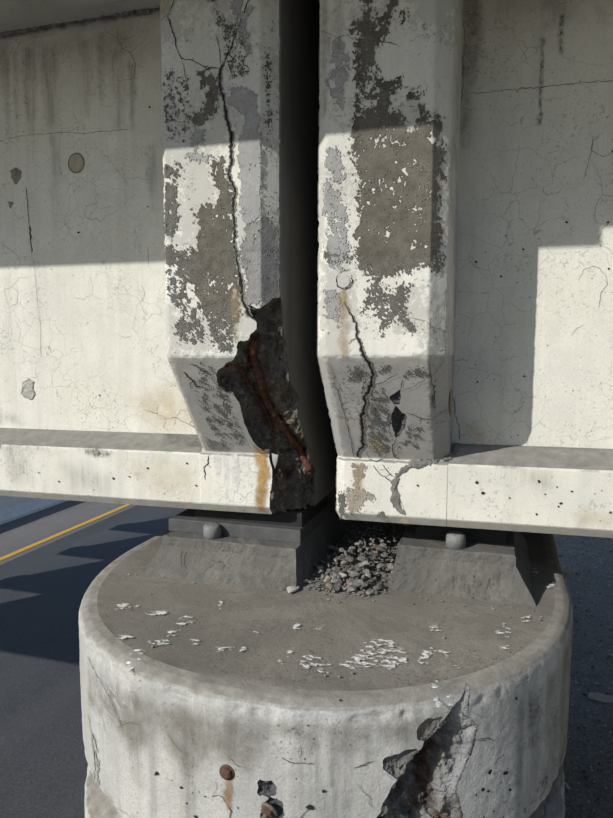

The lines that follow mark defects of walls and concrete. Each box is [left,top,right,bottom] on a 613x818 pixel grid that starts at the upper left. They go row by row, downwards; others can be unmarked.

crack [161,0,261,318]
spalling [162,0,315,513]
peeling [322,0,447,339]
crack [555,134,613,308]
rust [253,445,270,511]
spalling [346,363,424,459]
crack [330,269,460,515]
peeling [403,363,439,409]
spalling [376,681,479,818]